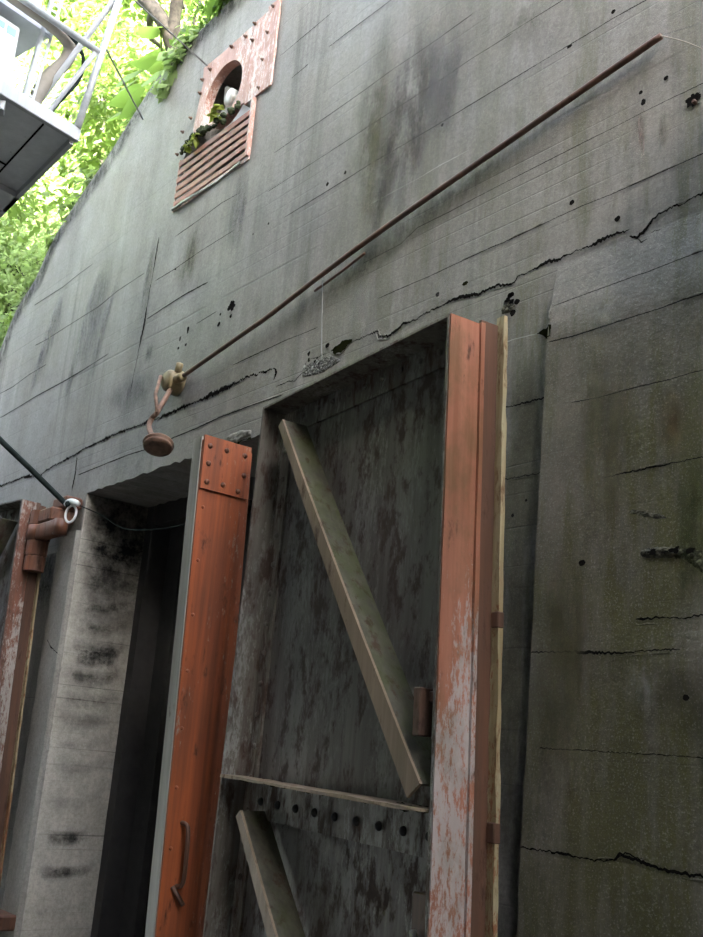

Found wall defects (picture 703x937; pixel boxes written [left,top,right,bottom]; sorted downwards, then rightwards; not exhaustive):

crack [355,192,703,341]
crack [131,239,159,387]
spalling [501,292,520,317]
spalling [302,339,352,377]
crack [506,397,544,407]
crack [0,352,329,488]
crack [605,456,703,478]
spalling [640,546,703,573]
crack [636,614,703,625]
crack [531,648,680,657]
crack [520,846,703,882]